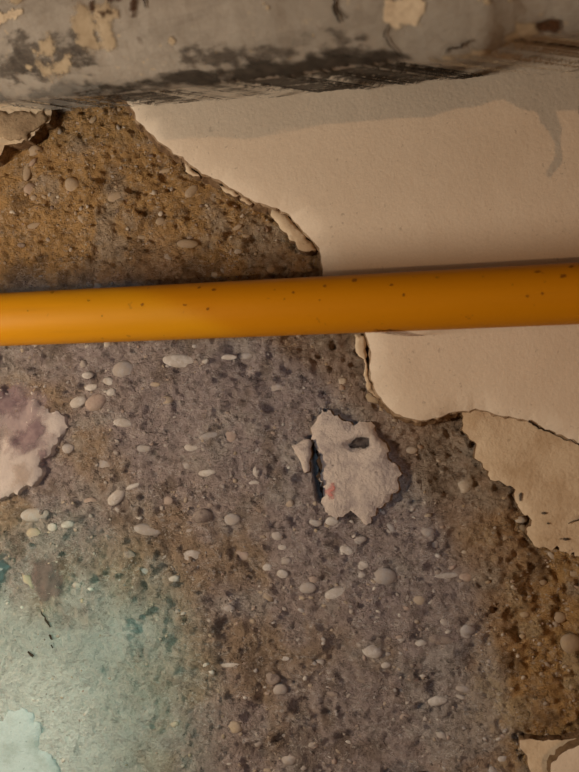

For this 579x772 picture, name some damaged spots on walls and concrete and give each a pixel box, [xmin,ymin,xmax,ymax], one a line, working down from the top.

peeling [0,0,23,24]
peeling [25,32,71,82]
peeling [71,0,119,52]
water stain [0,29,483,112]
peeling [383,0,426,31]
peeling [431,22,579,74]
spalling [0,95,320,293]
water stain [0,385,48,462]
crack [528,420,579,445]
spalling [0,333,579,772]
water stain [31,560,62,602]